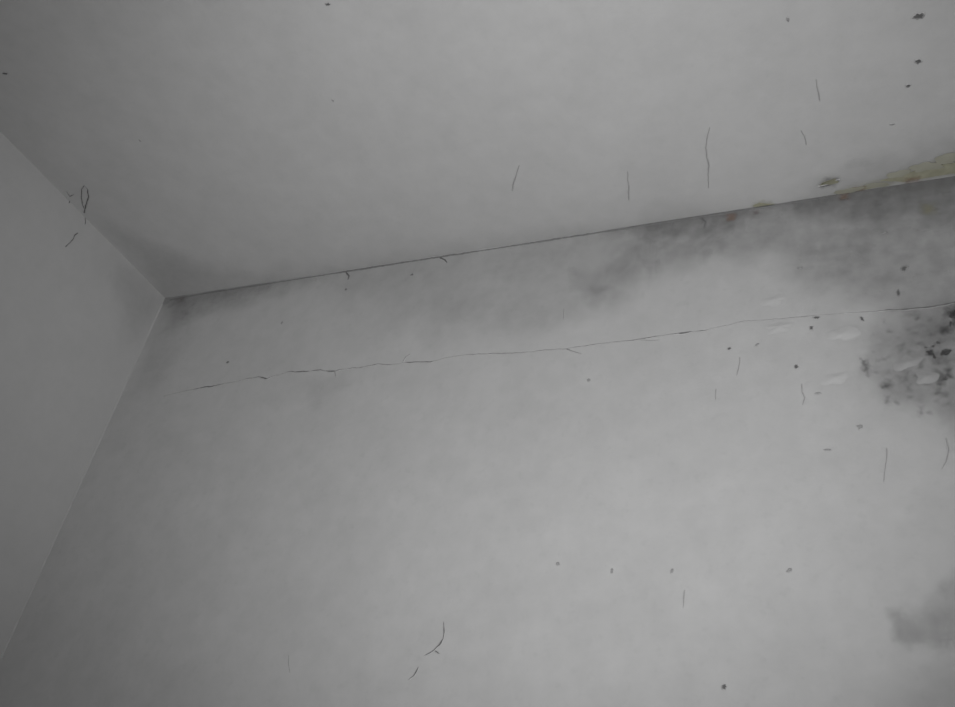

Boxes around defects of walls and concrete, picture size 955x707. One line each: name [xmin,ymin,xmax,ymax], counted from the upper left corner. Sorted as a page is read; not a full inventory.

crack [703,127,711,188]
peeling [818,153,955,194]
crack [65,185,90,248]
crack [165,301,955,396]
crack [409,622,446,680]